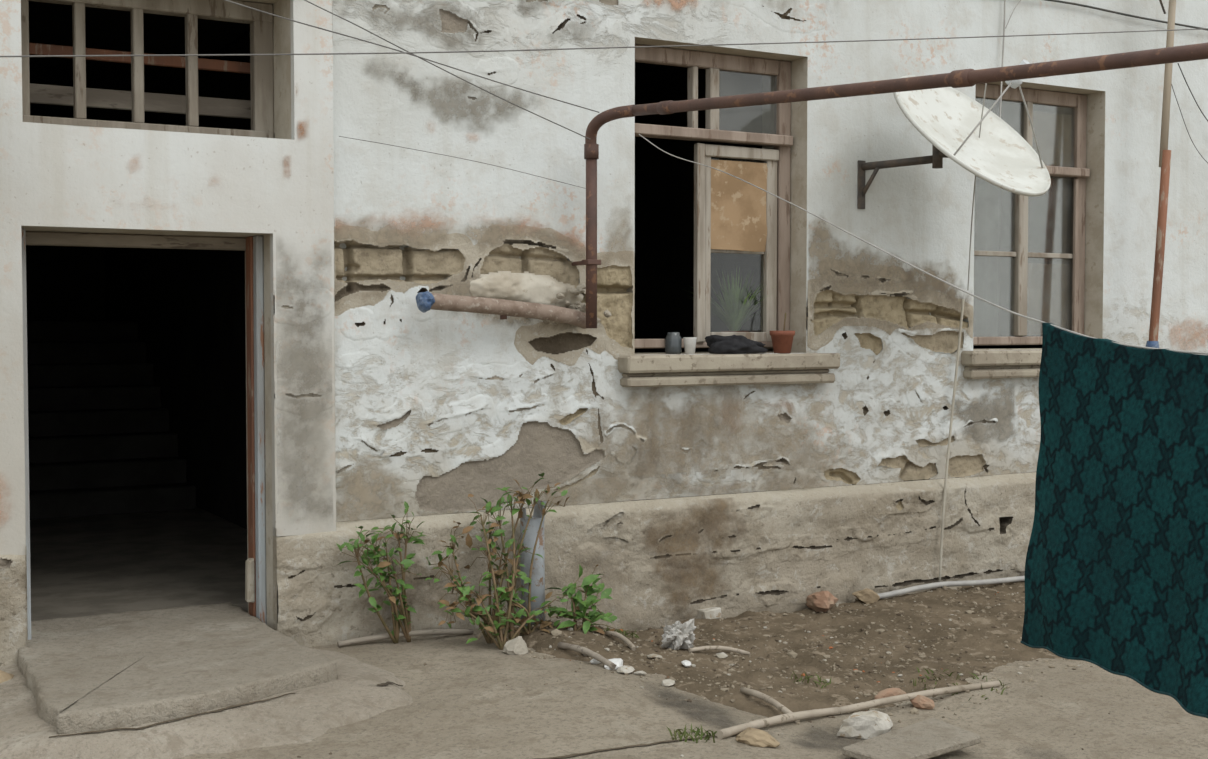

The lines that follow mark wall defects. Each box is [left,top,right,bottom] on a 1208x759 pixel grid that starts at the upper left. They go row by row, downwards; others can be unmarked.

spalling [398,0,479,51]
spalling [510,0,568,18]
spalling [585,0,694,19]
spalling [274,216,635,517]
spalling [806,284,973,367]
flaking render [765,399,803,437]
spalling [812,375,991,488]
leakage [648,482,736,602]